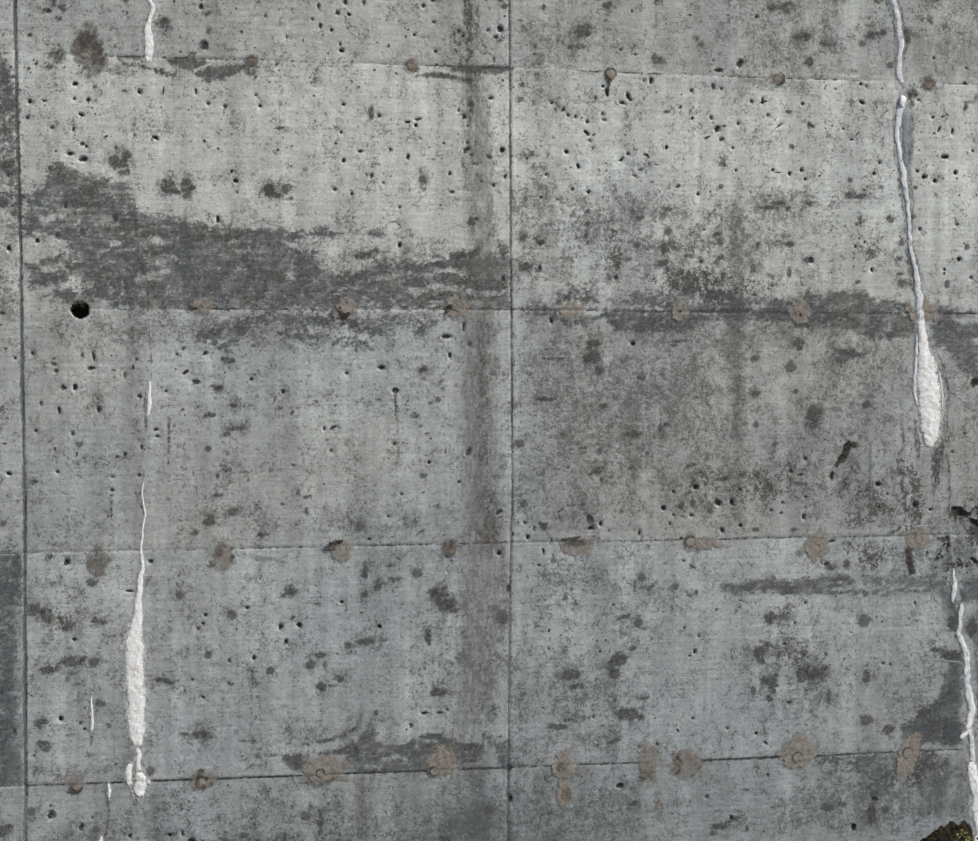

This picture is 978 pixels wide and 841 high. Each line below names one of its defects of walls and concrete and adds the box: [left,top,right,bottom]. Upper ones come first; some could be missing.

water stain [0,0,978,503]
water stain [721,546,978,841]